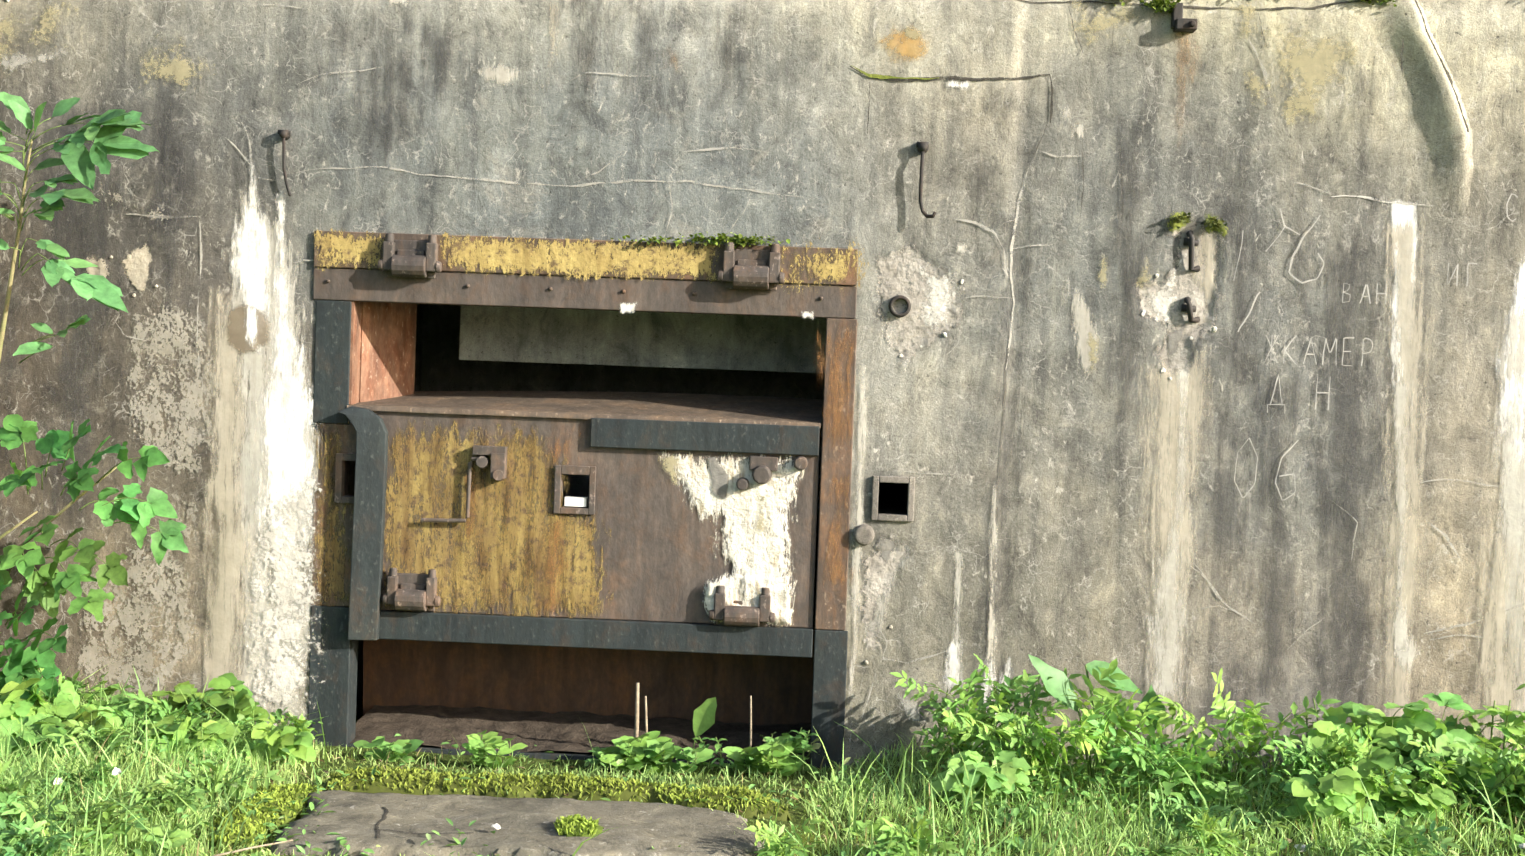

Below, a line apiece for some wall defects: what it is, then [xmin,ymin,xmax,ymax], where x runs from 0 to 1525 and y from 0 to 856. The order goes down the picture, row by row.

damp [478,64,518,86]
crack [1020,0,1373,104]
peeling [314,229,384,271]
peeling [438,232,720,281]
spalling [781,238,966,371]
crack [850,65,1084,652]
spalling [1133,212,1227,381]
crack [1295,182,1432,206]
damp [204,166,325,726]
damp [1316,201,1434,717]
damp [1480,264,1525,747]
crack [1189,565,1255,624]